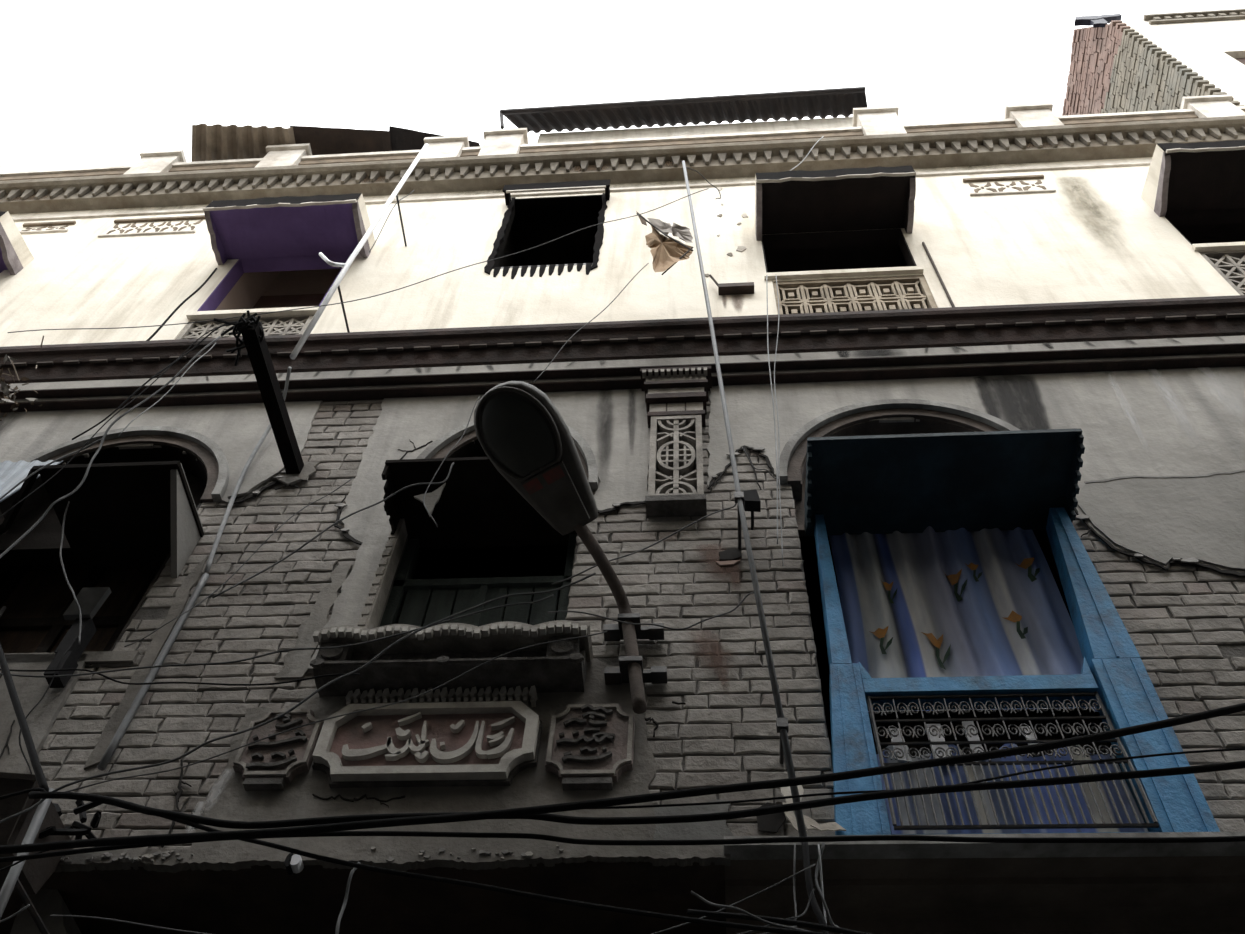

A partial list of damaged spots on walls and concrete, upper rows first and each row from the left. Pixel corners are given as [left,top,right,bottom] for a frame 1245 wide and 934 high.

water stain [976,375,1050,430]
crack [0,720,15,759]